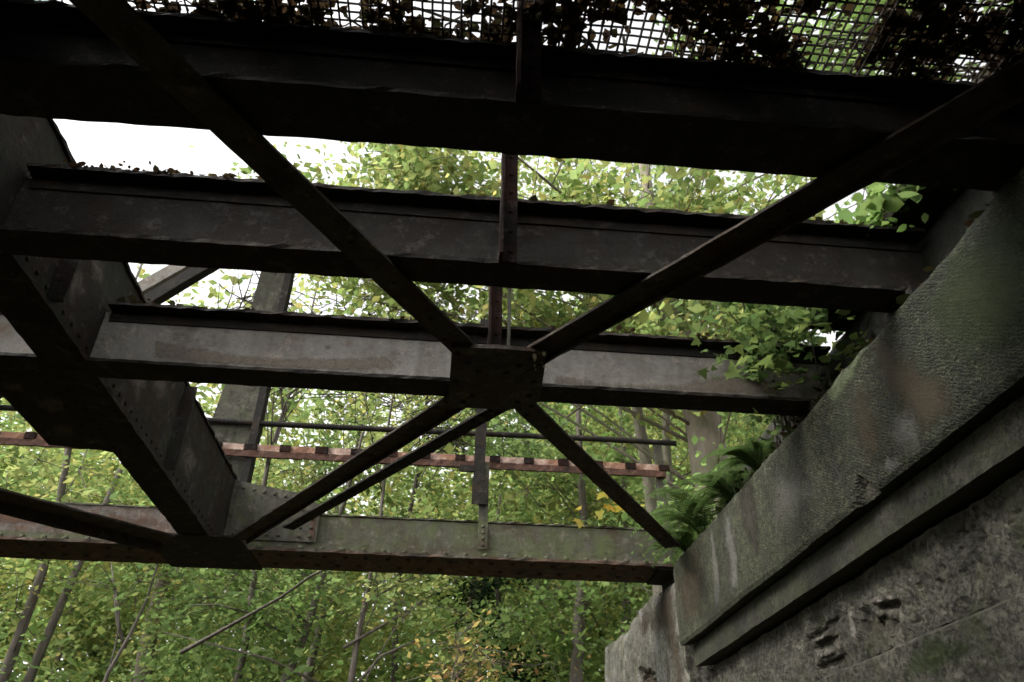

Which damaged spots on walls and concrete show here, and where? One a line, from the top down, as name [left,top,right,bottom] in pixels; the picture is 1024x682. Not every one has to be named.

rust [0,514,30,523]
spalling [804,587,911,682]